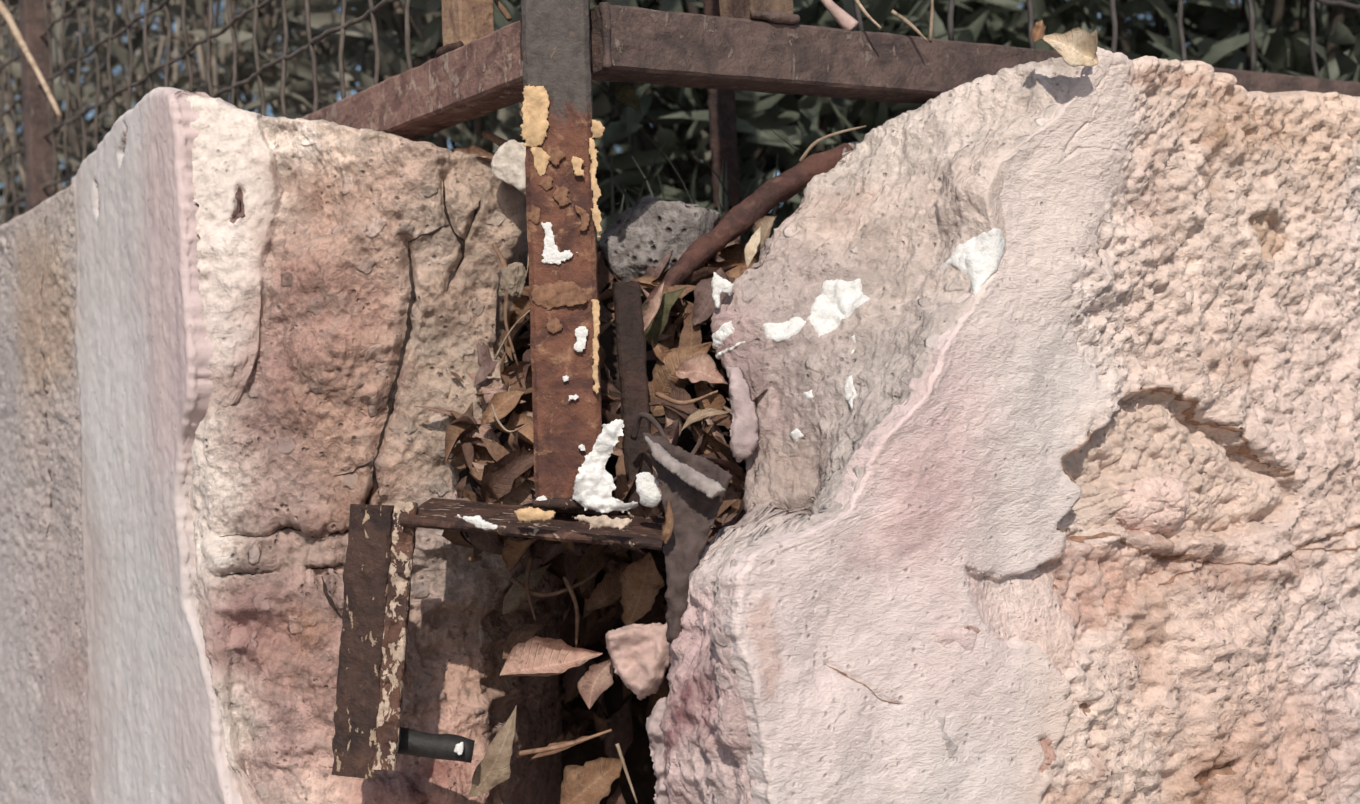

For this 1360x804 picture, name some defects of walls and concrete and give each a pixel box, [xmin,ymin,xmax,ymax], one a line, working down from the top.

flaking render [1066,64,1137,155]
crack [219,179,481,618]
spalling [659,57,1086,804]
flaking render [931,391,1301,675]
crack [1158,525,1360,587]